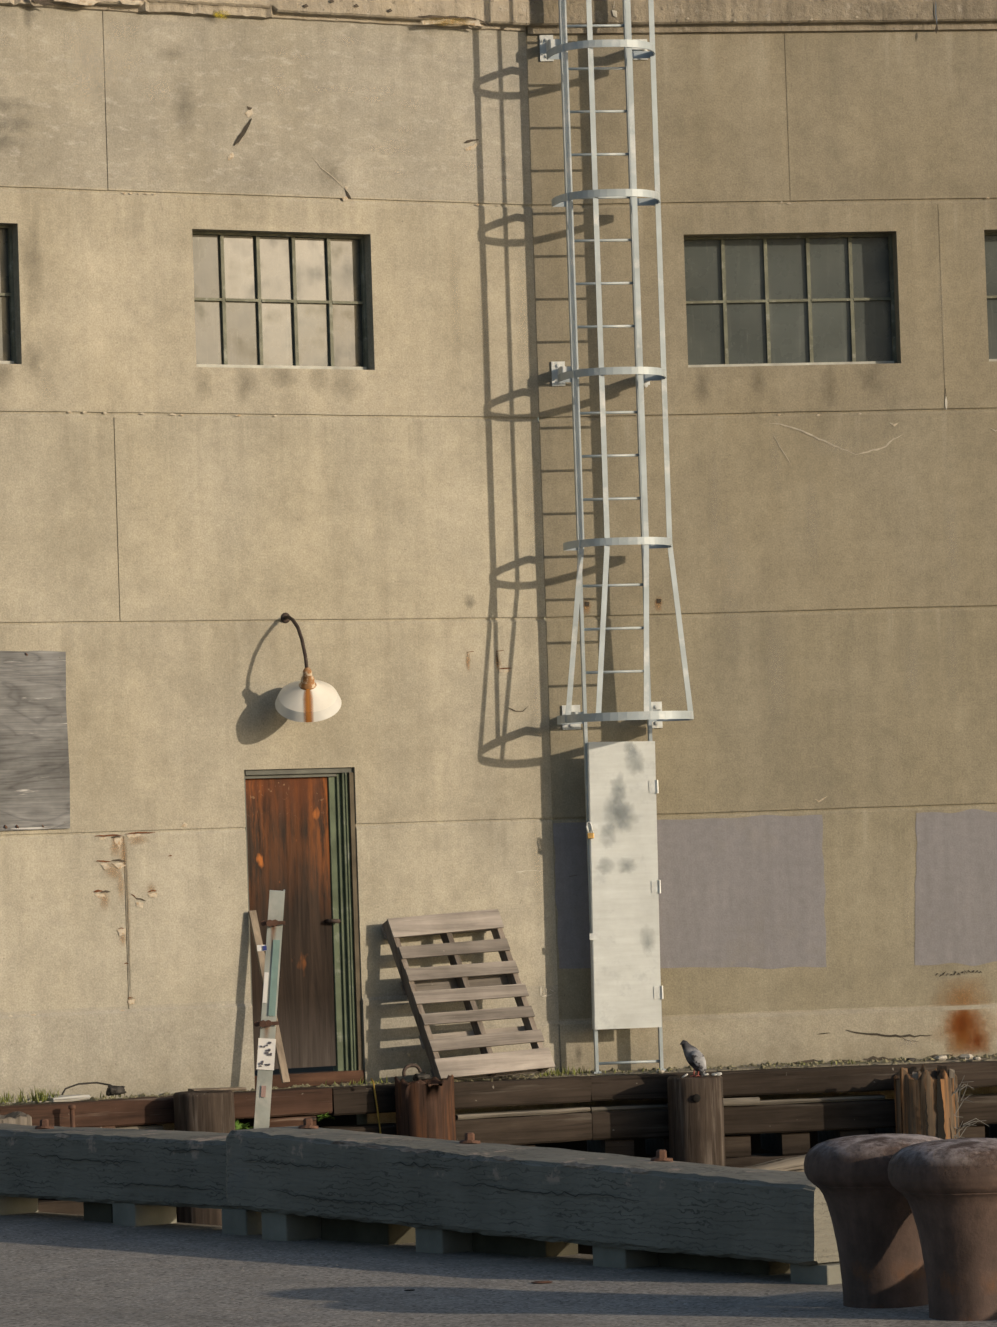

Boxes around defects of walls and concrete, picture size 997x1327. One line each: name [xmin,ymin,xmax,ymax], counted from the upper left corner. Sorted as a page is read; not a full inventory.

spalling [418,15,494,27]
crack [770,423,901,464]
spalling [97,832,155,870]
crack [792,1030,952,1064]
rust [953,1012,983,1048]